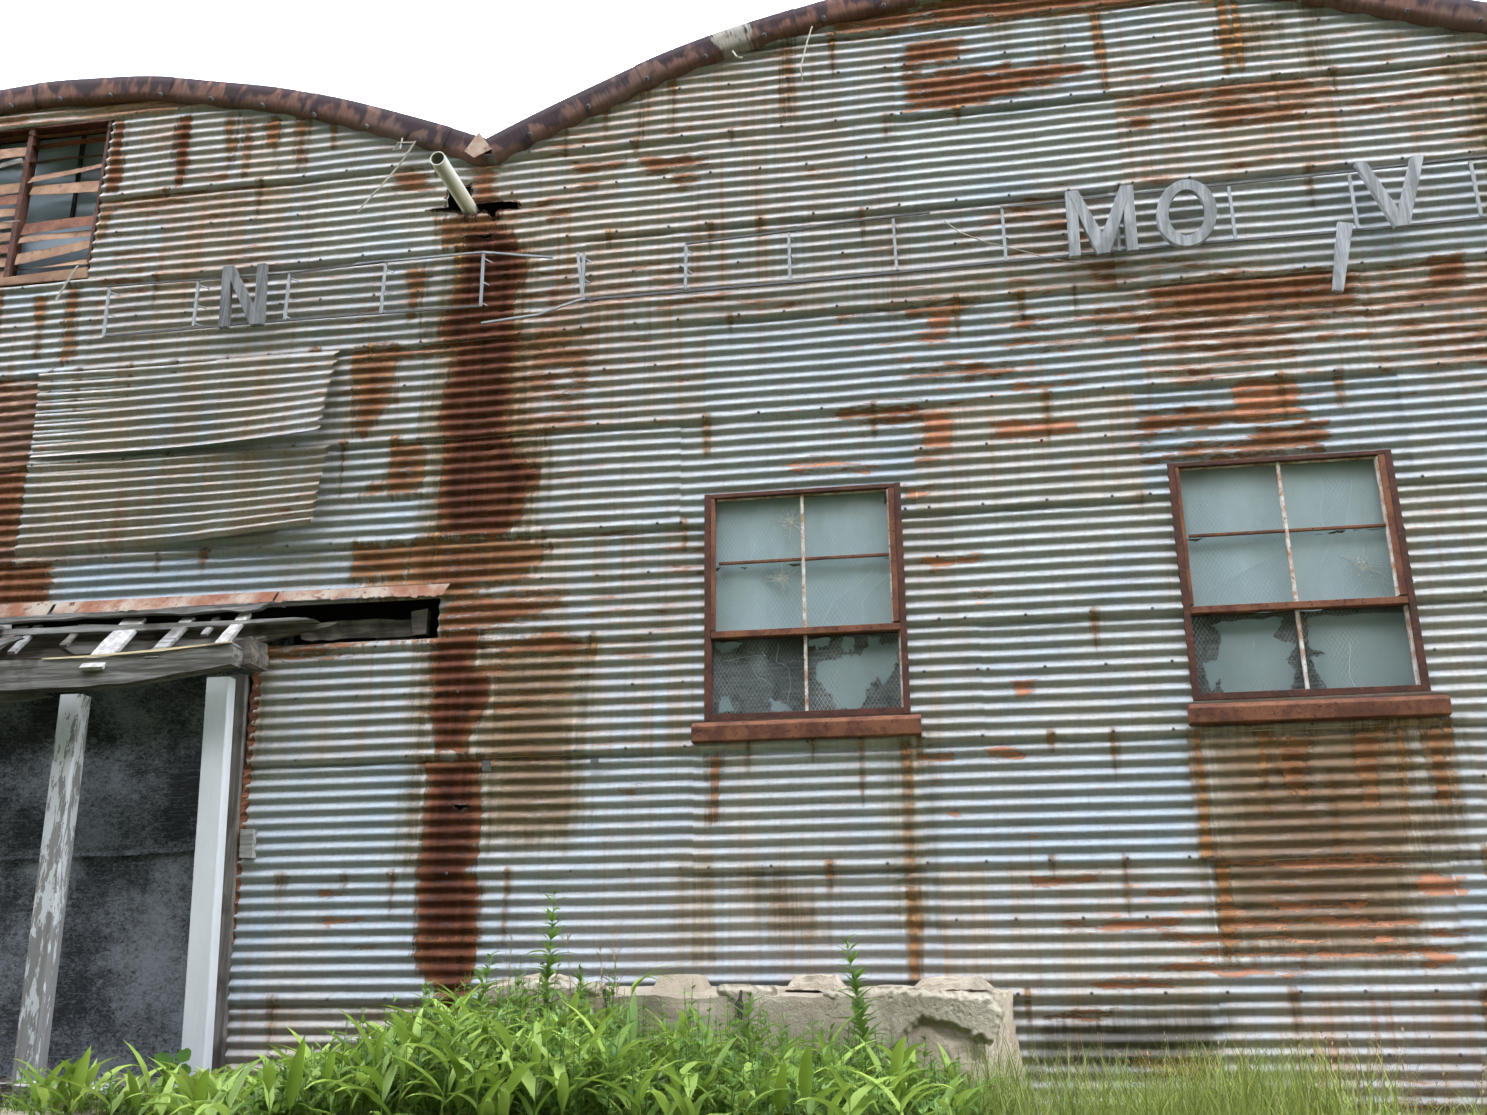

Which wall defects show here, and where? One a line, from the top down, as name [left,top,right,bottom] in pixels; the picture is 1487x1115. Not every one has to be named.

corrosion [95,118,129,244]
corrosion [163,114,193,197]
corrosion [224,115,312,218]
corrosion [564,90,710,194]
corrosion [779,36,797,124]
corrosion [827,0,1337,134]
corrosion [1454,64,1487,148]
corrosion [1420,249,1467,294]
corrosion [1132,368,1345,465]
corrosion [0,455,56,617]
corrosion [231,161,597,1034]
corrosion [1187,717,1487,958]